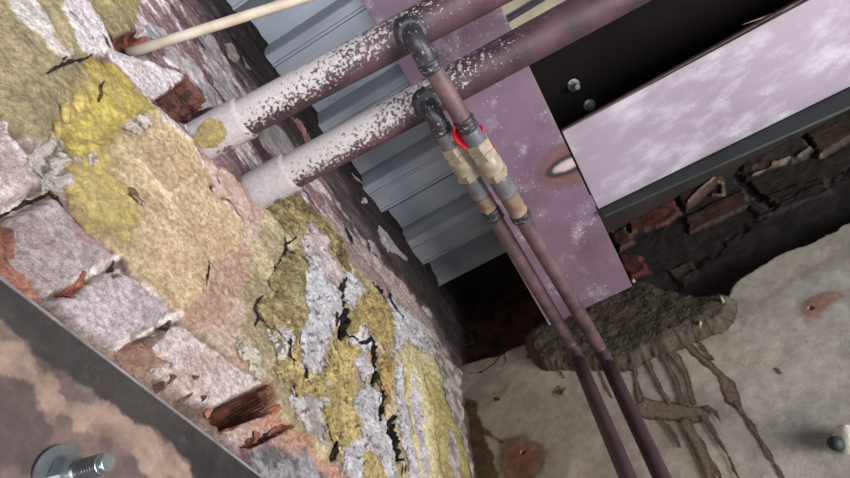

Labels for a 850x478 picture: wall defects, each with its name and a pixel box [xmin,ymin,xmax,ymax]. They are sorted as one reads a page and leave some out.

peeling [152,34,251,124]
crack [253,236,309,379]
rust [803,292,842,322]
spalling [114,320,177,394]
spalling [179,385,281,431]
spalling [239,424,294,450]
crack [329,440,340,460]
crack [336,272,407,477]
peeling [433,350,474,478]
rust [465,399,546,478]
leakage [632,350,740,478]
leakage [733,400,785,478]